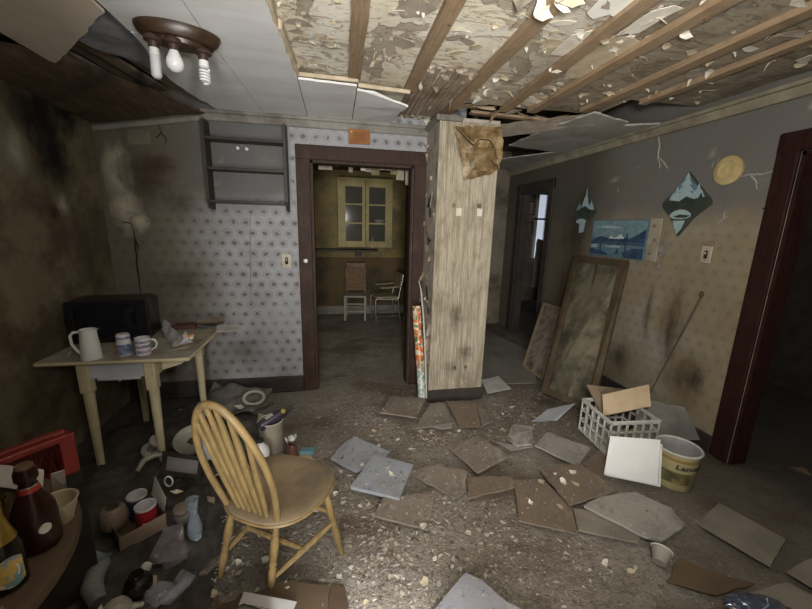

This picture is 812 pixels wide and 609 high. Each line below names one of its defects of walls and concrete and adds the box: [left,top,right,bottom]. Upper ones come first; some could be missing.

peeling [389,0,441,18]
peeling [789,0,808,8]
peeling [284,18,336,49]
peeling [369,36,415,68]
peeling [513,0,683,107]
peeling [765,30,812,68]
flaking render [398,30,523,125]
peeling [686,60,718,105]